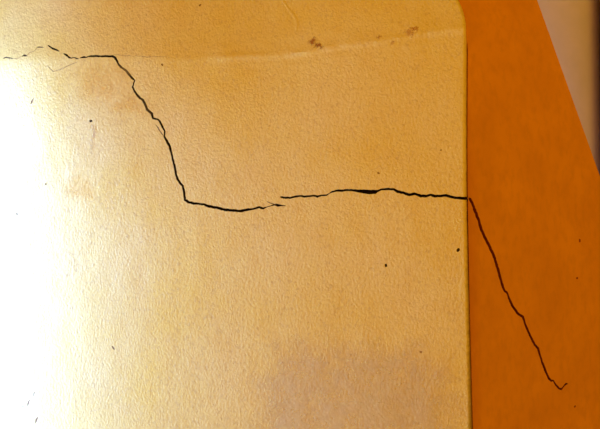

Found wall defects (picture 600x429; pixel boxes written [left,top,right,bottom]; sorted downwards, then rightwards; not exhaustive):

crack [3,46,568,390]